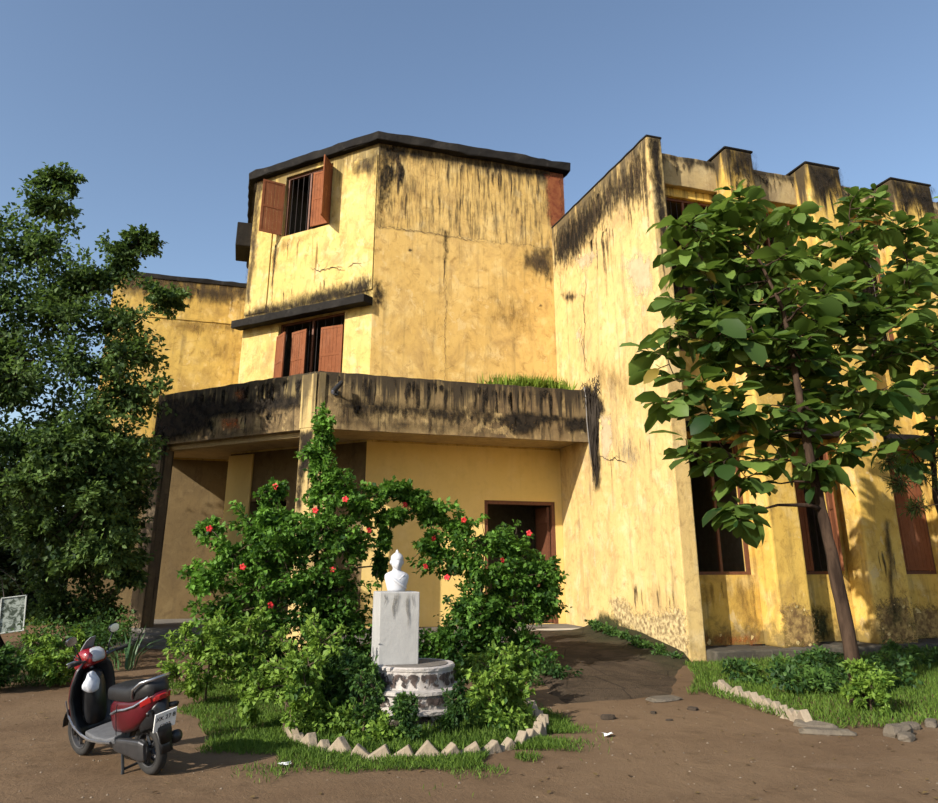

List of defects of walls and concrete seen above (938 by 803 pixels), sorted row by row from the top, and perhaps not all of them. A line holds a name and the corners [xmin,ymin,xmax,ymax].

damp [122,182,384,318]
damp [353,146,547,217]
damp [525,139,712,282]
damp [726,149,793,203]
damp [804,162,850,220]
damp [893,180,934,218]
damp [339,379,612,489]
damp [878,521,897,612]